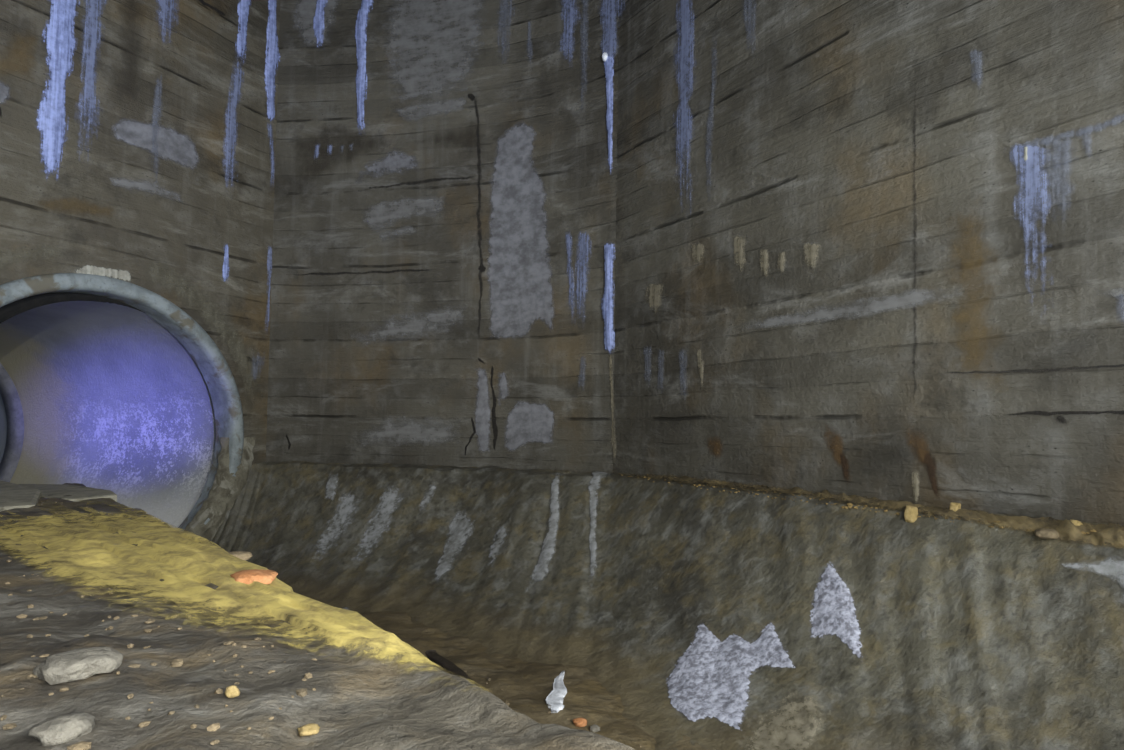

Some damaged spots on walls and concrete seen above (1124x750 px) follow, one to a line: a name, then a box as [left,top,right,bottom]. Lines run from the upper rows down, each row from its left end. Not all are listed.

leakage [36,0,106,176]
leakage [224,0,251,178]
leakage [264,0,280,180]
leakage [306,0,373,173]
leakage [601,0,622,171]
crack [302,268,425,276]
crack [370,94,486,331]
peeling [487,123,554,338]
leakage [602,243,616,457]
leakage [532,476,559,581]
spalling [666,622,796,730]
spalling [810,562,863,658]